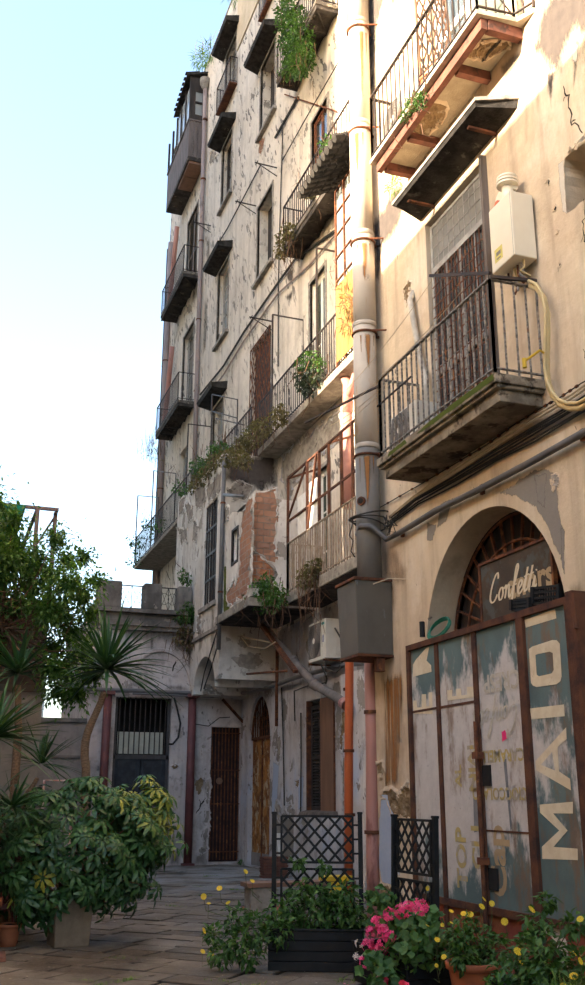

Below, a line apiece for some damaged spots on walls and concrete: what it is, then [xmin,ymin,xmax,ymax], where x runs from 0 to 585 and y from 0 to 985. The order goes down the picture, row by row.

rust [354,31,367,90]
spalling [466,39,512,62]
crack [563,86,583,133]
rust [351,132,363,169]
spalling [544,132,585,213]
rust [357,243,370,278]
rust [360,334,374,365]
peeling [176,410,343,607]
rust [384,676,402,784]
spalling [375,759,411,824]